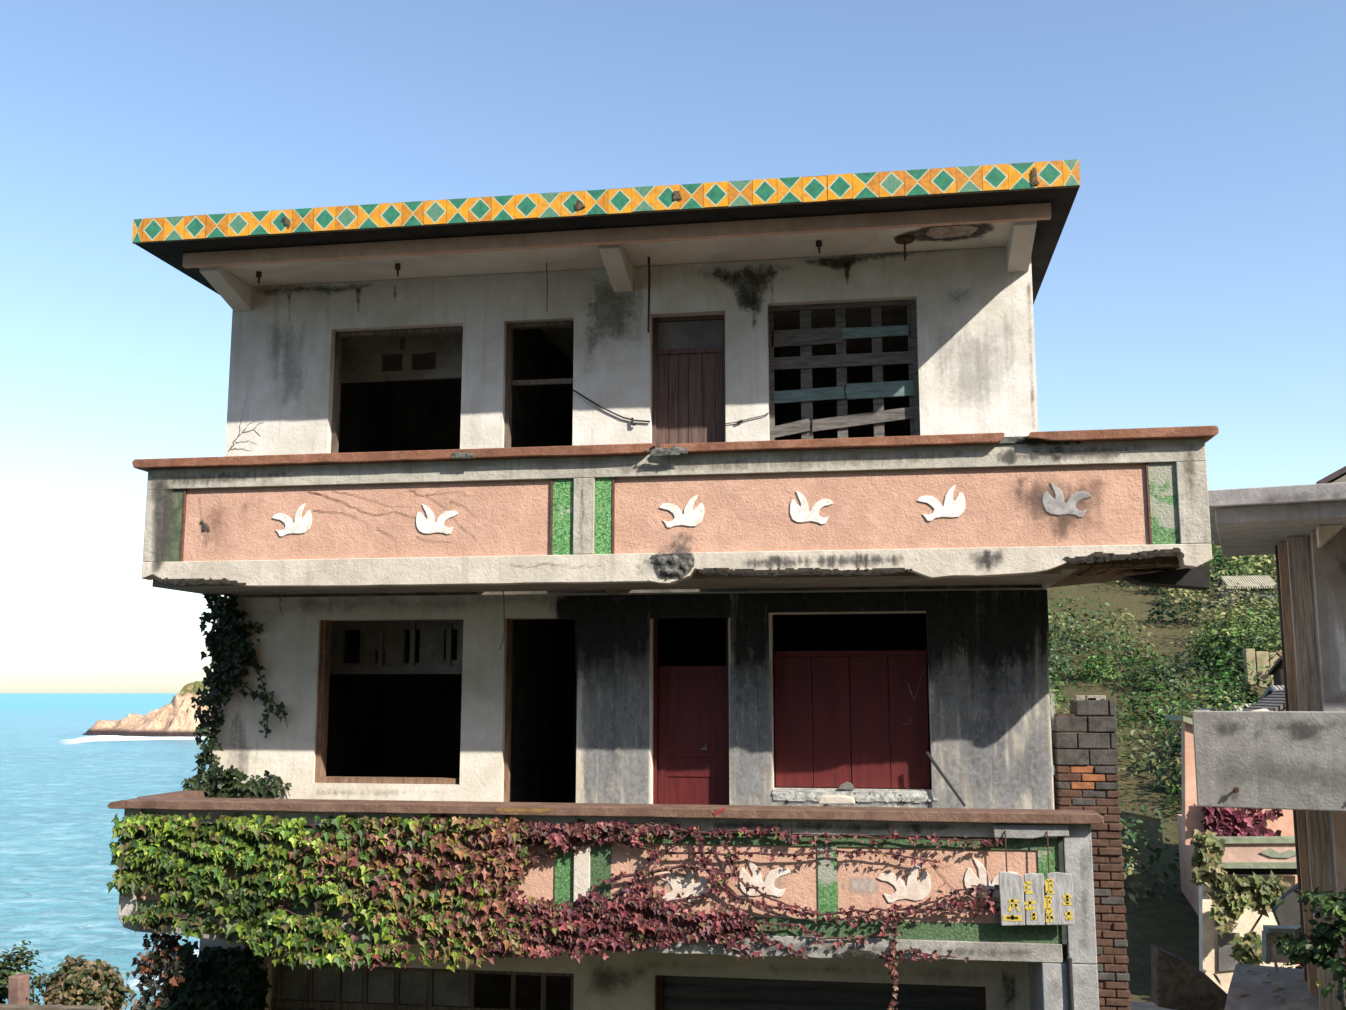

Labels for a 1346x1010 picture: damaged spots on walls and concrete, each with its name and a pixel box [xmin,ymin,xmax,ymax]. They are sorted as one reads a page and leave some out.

leakage [713,266,788,323]
crack [228,393,264,451]
crack [309,488,598,568]
spalling [652,553,912,579]
spalling [1064,548,1184,564]